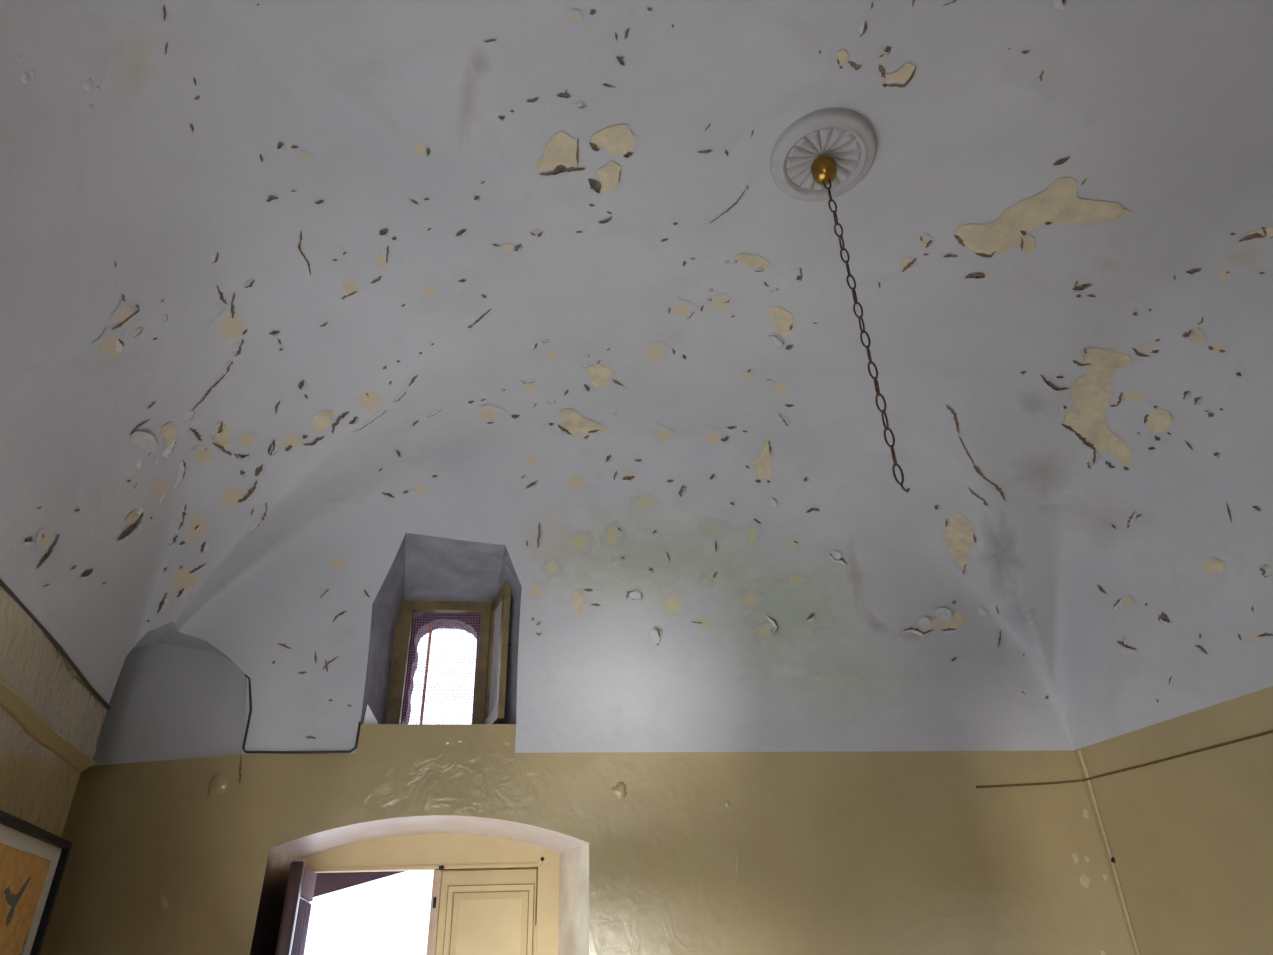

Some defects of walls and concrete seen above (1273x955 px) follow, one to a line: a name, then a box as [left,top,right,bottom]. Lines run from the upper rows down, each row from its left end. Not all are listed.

peeling [876,47,916,89]
peeling [208,279,255,375]
peeling [337,229,396,299]
peeling [536,125,635,224]
peeling [724,253,795,350]
peeling [896,233,933,273]
peeling [944,157,1132,280]
peeling [1230,227,1273,243]
peeling [500,348,623,439]
peeling [1020,339,1173,471]
peeling [1183,391,1223,419]
peeling [934,505,976,575]